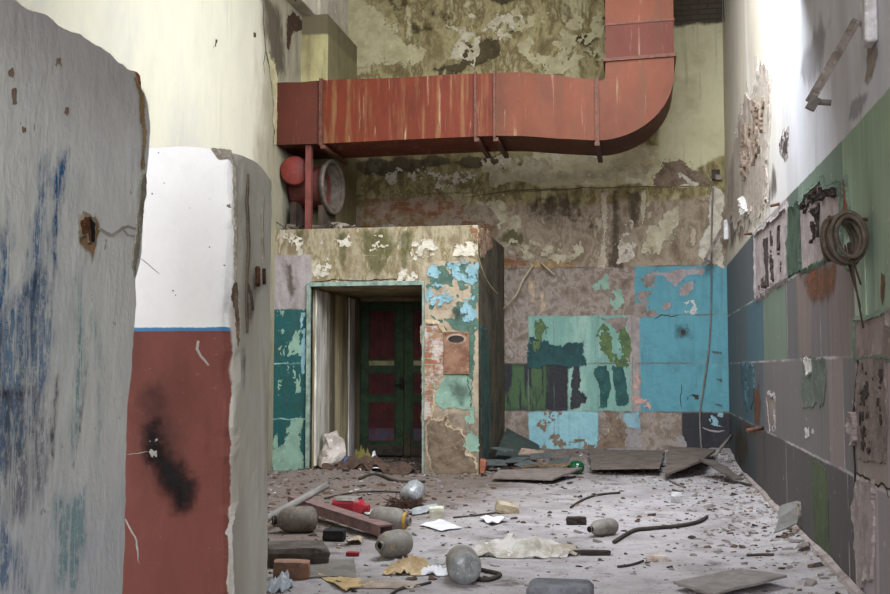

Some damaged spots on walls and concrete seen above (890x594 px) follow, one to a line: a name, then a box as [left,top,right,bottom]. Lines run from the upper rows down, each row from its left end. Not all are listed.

damp [434,38,500,74]
damp [559,35,605,66]
crack [98,225,136,237]
peeling [357,54,851,475]
crack [851,360,859,412]
spalling [845,307,890,464]
crack [853,446,890,498]
spalling [850,479,876,589]